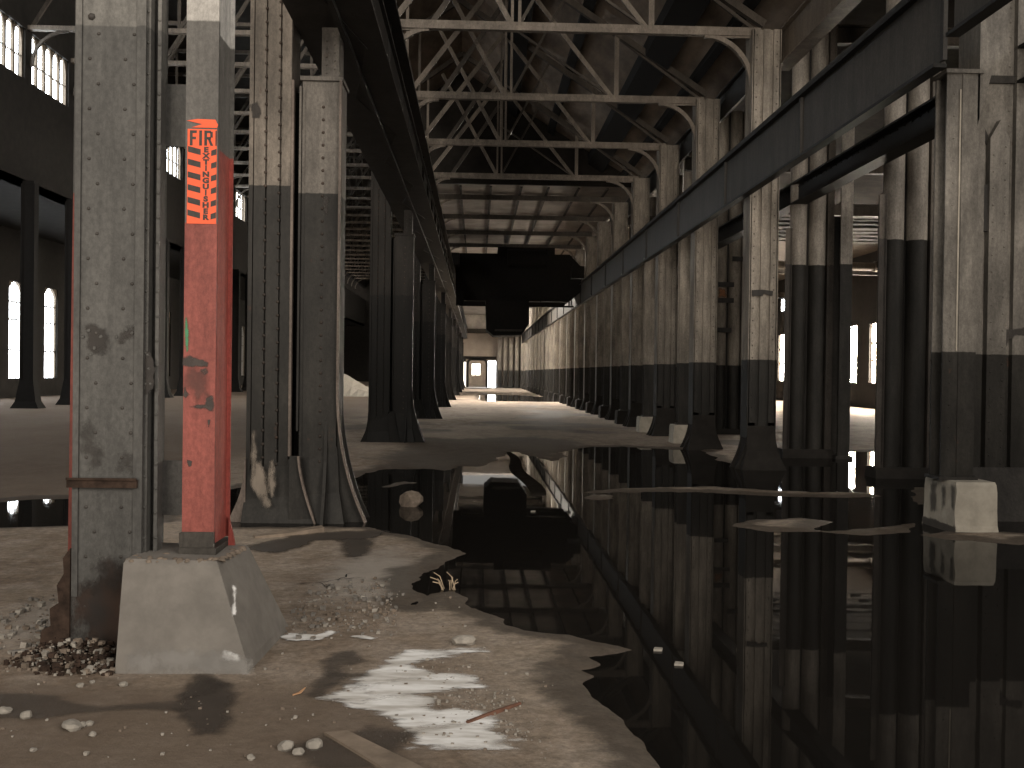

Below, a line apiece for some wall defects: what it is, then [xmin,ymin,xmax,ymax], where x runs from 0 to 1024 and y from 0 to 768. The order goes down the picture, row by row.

peeling [183,356,214,427]
peeling [251,436,275,507]